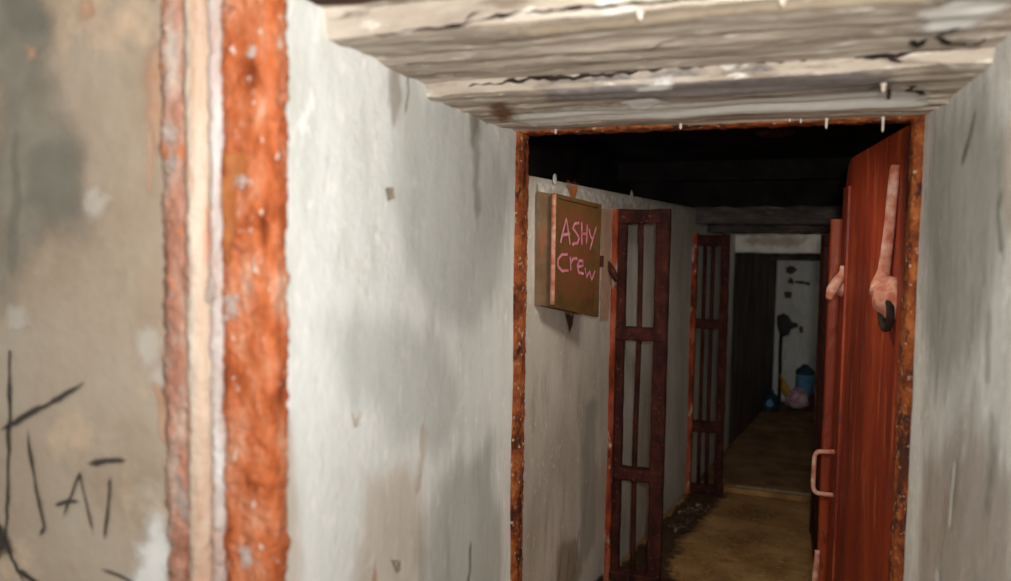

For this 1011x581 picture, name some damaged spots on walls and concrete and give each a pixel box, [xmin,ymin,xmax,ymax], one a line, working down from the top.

crack [376,0,681,37]
crack [468,23,851,87]
crack [854,28,986,62]
crack [863,84,928,99]
damp [0,0,76,290]
corrosion [221,152,248,261]